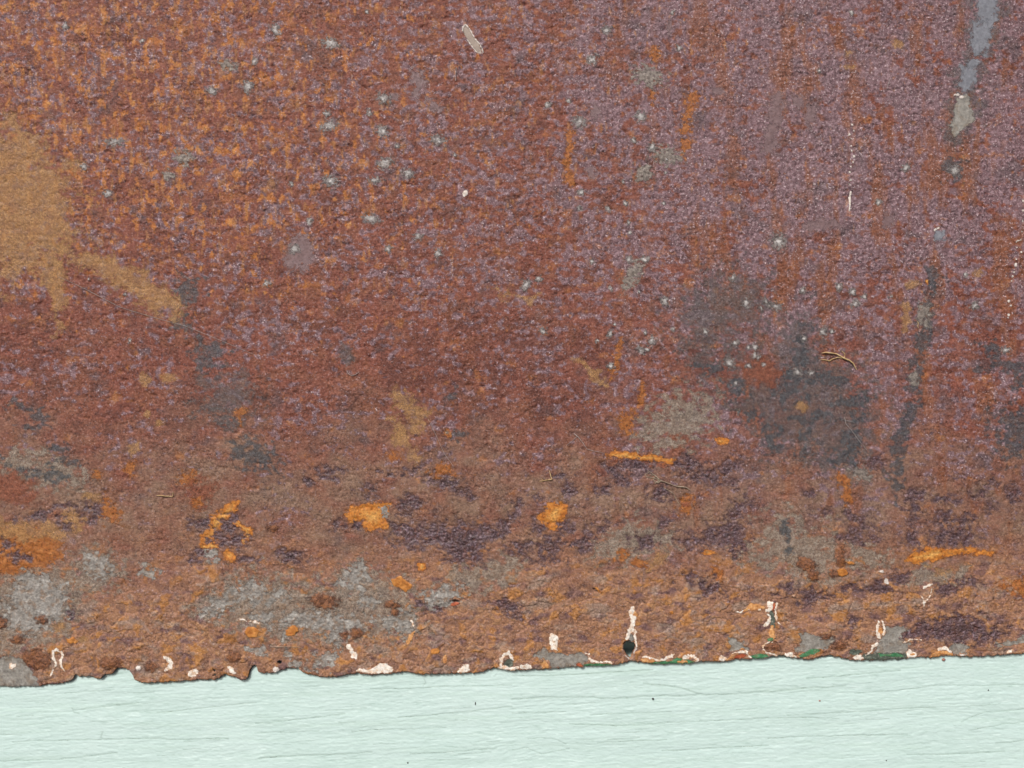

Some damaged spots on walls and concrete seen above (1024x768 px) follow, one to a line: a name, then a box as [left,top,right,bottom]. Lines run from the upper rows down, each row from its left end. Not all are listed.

rust [561,130,576,187]
rust [743,357,782,388]
rust [904,533,996,565]
peeling [0,648,65,687]
rust [22,648,51,670]
rust [99,656,122,670]
rust [226,650,240,662]
spalling [486,597,531,622]
peeling [498,633,612,671]
peeling [625,606,699,664]
spalling [719,568,911,662]
spalling [850,577,1024,661]